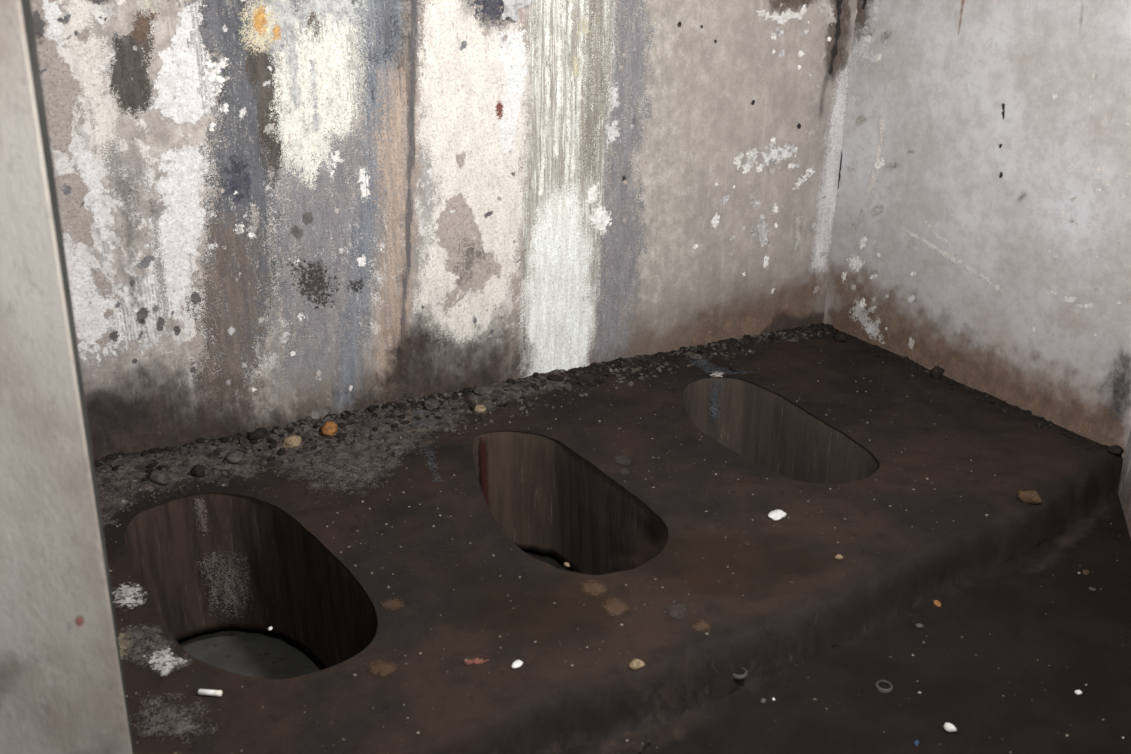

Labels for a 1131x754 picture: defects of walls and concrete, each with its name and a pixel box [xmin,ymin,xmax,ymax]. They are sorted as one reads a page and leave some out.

peeling [30,0,246,368]
peeling [235,203,262,239]